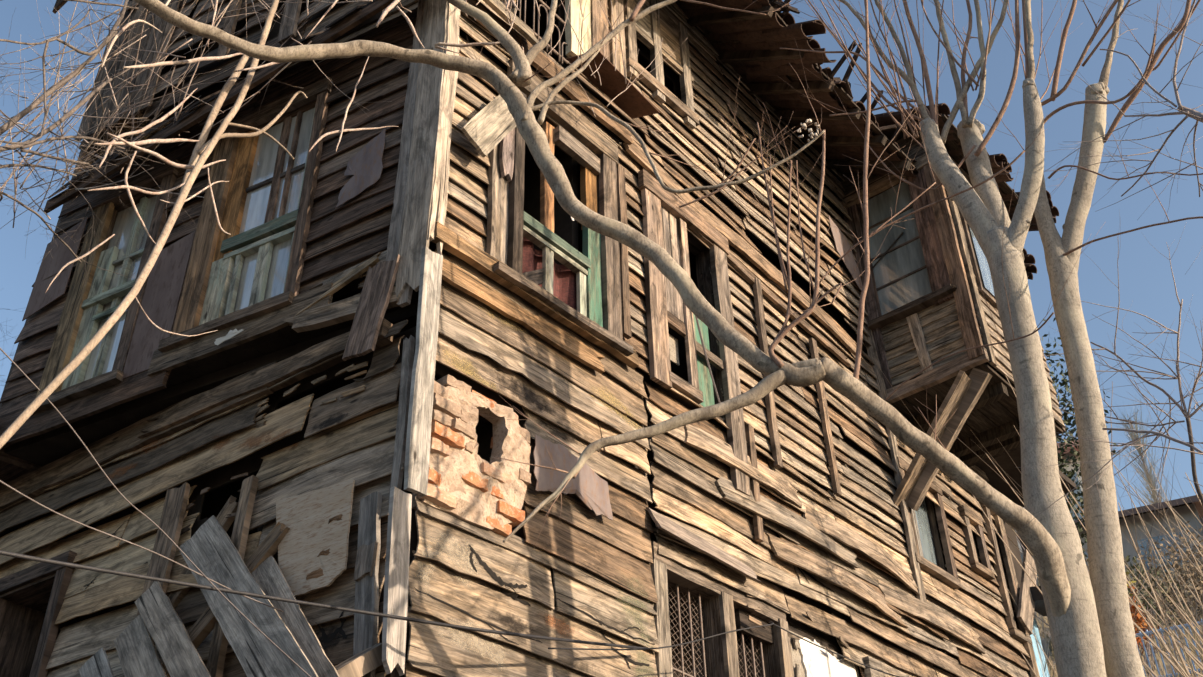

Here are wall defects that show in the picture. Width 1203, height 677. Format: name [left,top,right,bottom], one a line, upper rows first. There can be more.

spalling [407,374,531,538]
peeling [306,548,330,580]
crack [414,587,542,645]
crack [469,545,655,669]